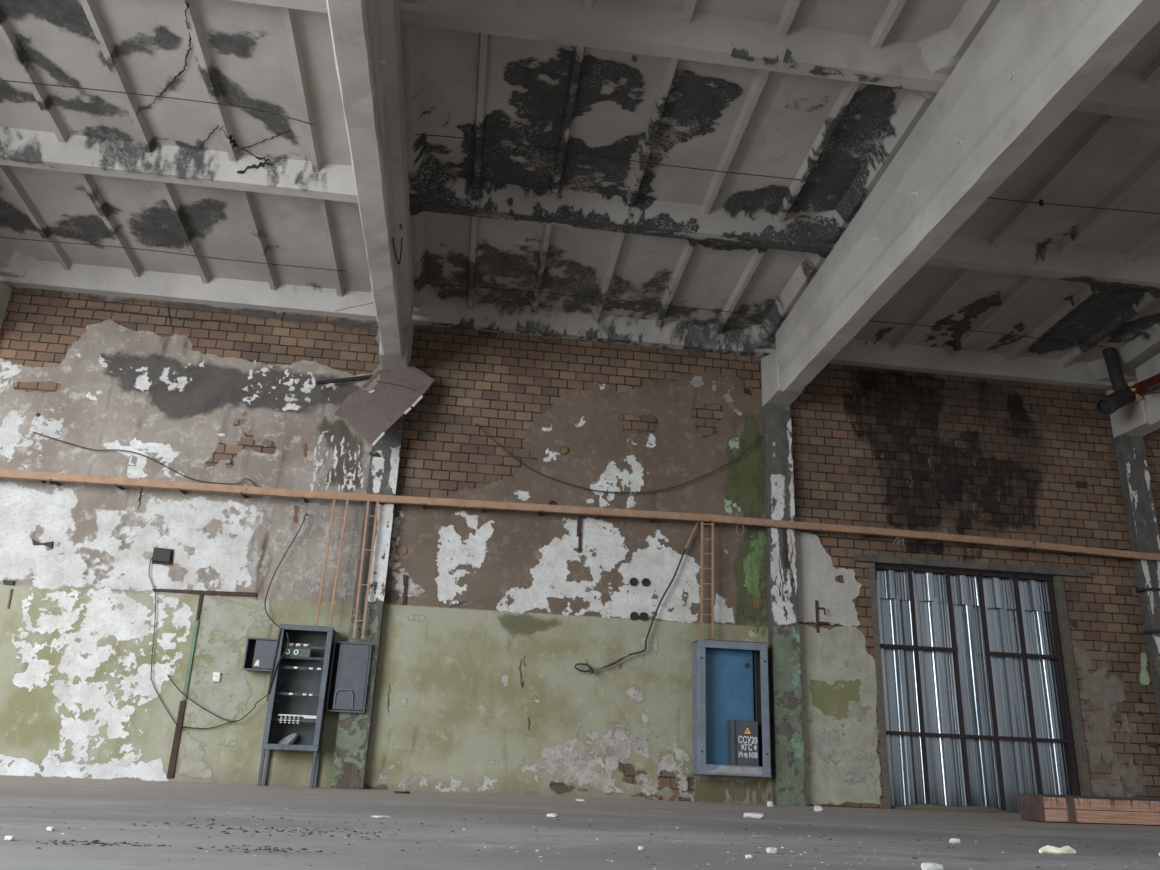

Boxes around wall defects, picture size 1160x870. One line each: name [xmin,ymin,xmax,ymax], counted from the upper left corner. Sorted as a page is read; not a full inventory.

water stain [0,0,180,71]
water stain [0,34,214,181]
water stain [0,187,226,248]
crack [136,0,192,116]
flaking render [0,286,380,470]
crack [197,125,290,174]
water stain [414,239,786,357]
water stain [408,47,902,282]
flaking render [0,325,763,801]
flaking render [770,419,882,806]
peeling [1127,448,1160,614]
flaking render [1071,619,1160,798]